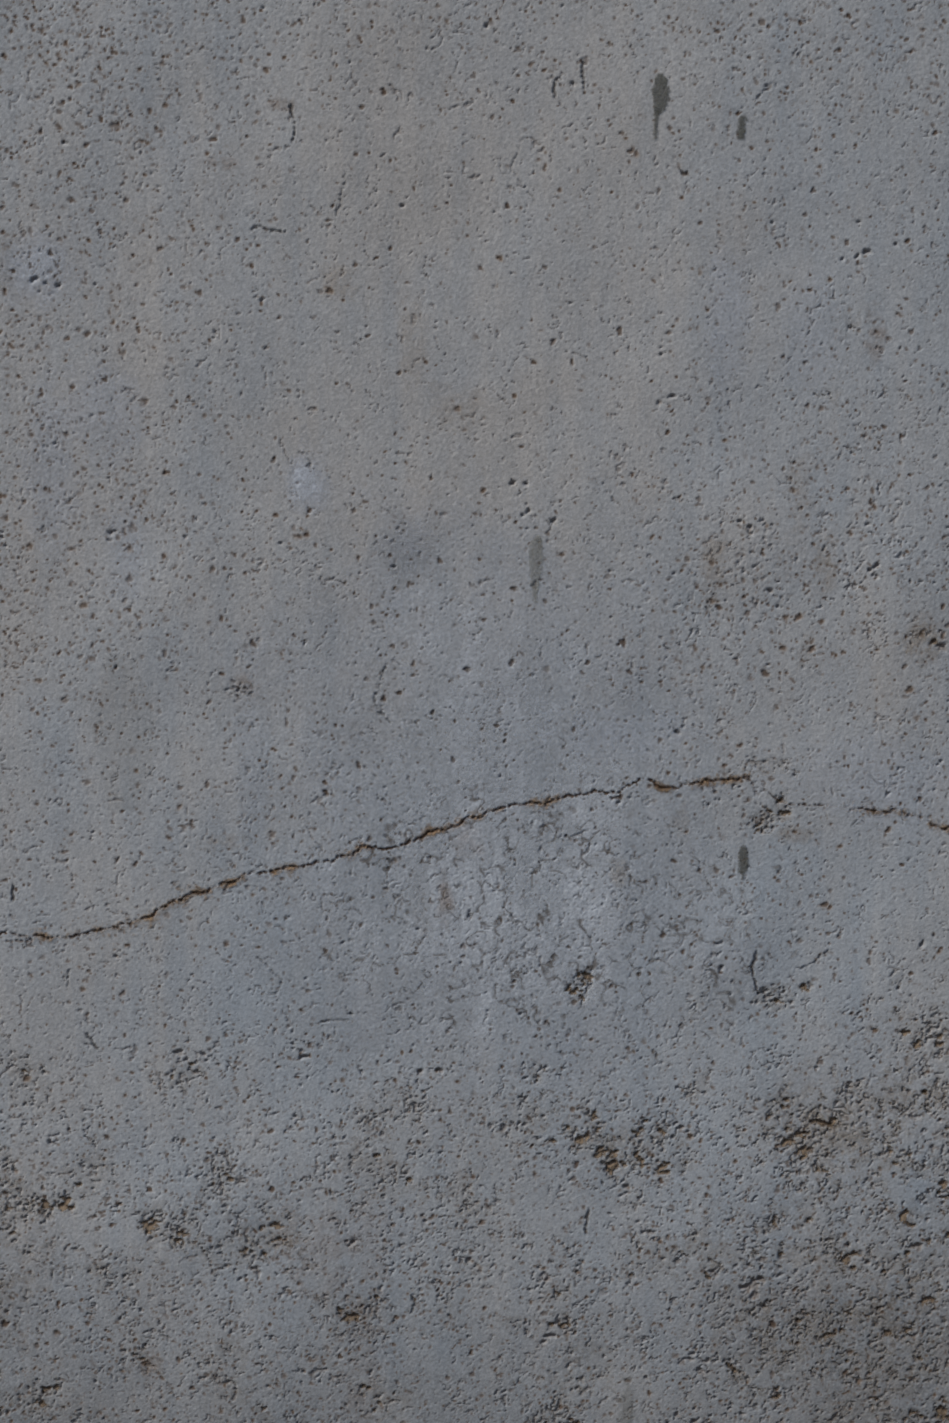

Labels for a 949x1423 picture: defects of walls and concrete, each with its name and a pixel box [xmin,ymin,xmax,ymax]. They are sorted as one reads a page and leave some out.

leakage [651,74,669,138]
crack [860,808,949,832]
crack [0,774,822,1023]